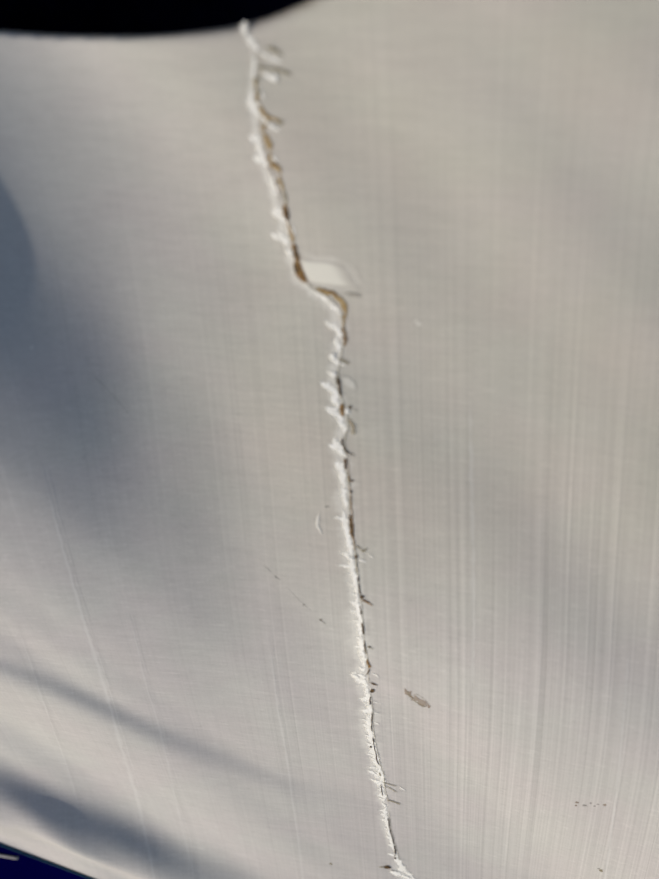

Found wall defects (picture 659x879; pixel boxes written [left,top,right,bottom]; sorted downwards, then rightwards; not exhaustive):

crack [240,21,417,879]